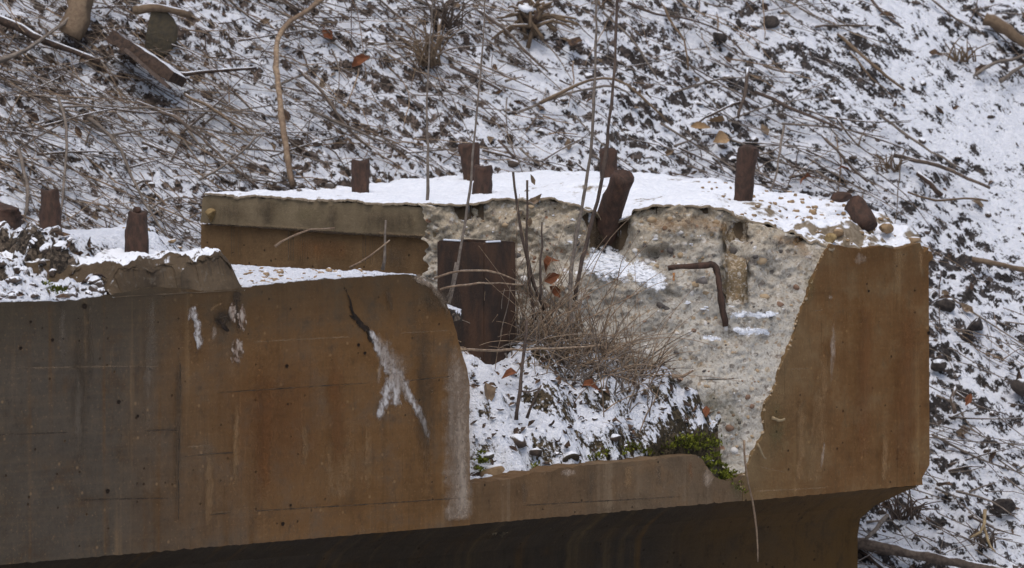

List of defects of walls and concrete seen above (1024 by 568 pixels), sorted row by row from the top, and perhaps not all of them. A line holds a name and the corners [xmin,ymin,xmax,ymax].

water stain [189,307,202,347]
crack [346,289,374,343]
spalling [628,212,709,296]
corrosion [668,261,729,327]
water stain [370,331,429,437]
spalling [704,369,760,454]